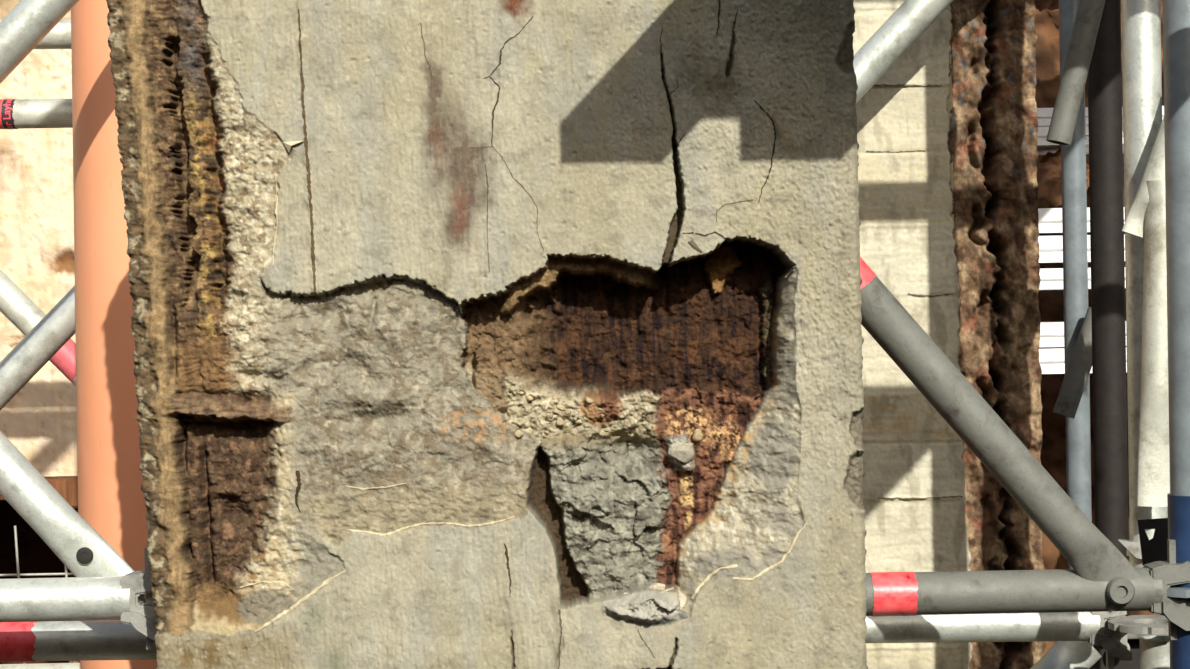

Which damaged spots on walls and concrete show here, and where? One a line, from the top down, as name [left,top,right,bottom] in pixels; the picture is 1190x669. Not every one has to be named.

crack [298,9,316,291]
corrosion [428,64,484,241]
crack [459,16,544,272]
crack [660,26,792,267]
crack [716,0,738,78]
spalling [106,0,807,637]